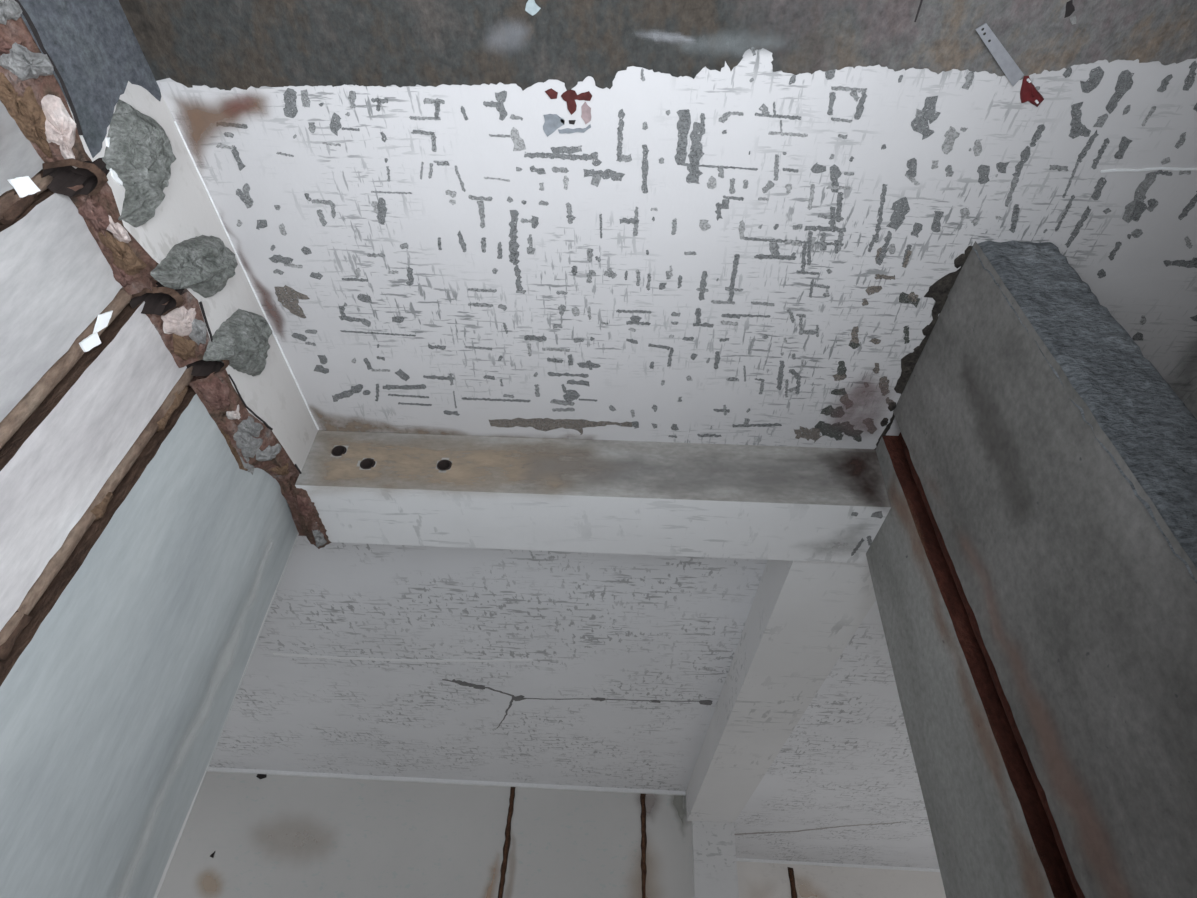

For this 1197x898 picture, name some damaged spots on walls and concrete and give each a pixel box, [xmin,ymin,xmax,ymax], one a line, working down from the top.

rust [0,192,38,225]
peeling [0,0,1197,450]
spalling [189,371,332,549]
crack [442,679,712,729]